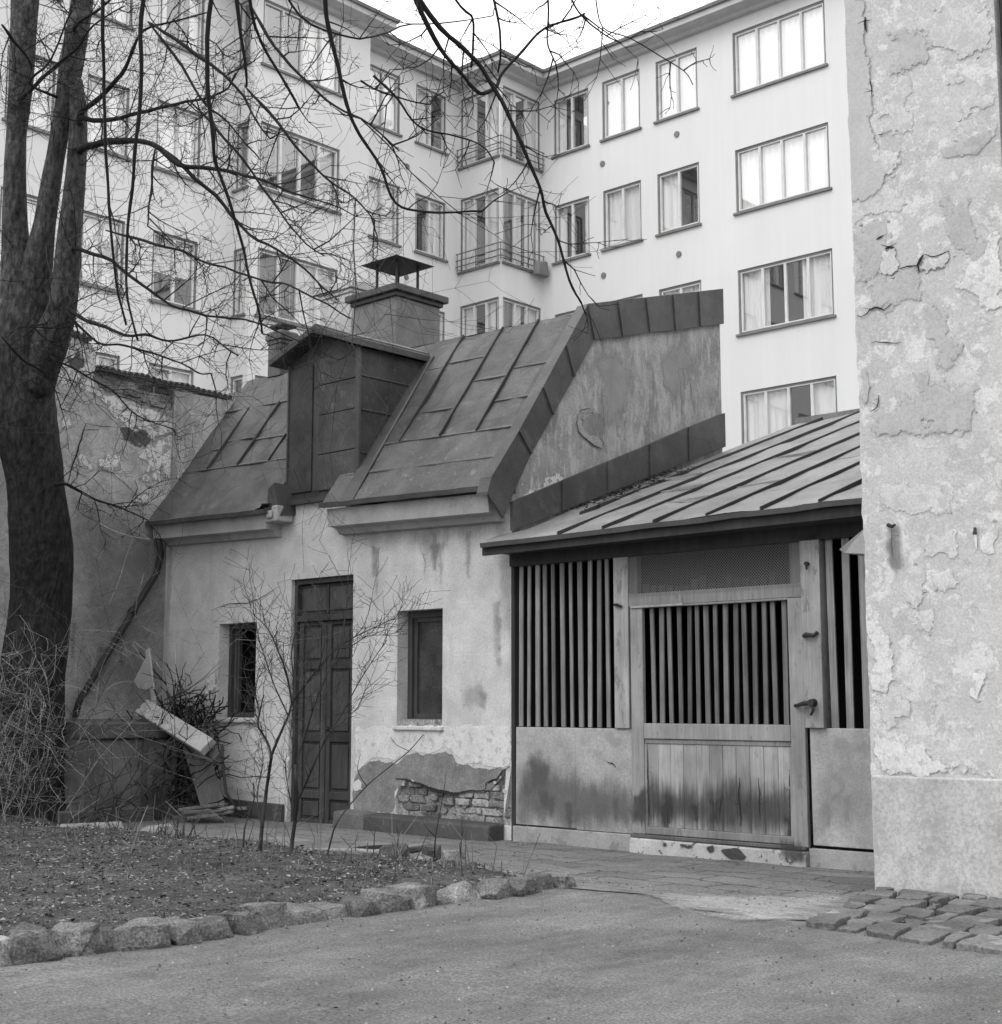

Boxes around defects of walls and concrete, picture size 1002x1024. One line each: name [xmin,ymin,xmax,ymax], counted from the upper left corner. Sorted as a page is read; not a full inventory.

peeling [915,4,992,60]
peeling [845,0,906,282]
peeling [938,194,1002,311]
peeling [912,304,964,392]
spalling [58,337,172,509]
peeling [923,529,959,592]
peeling [973,519,999,555]
peeling [866,617,895,694]
spalling [969,672,986,702]
peeling [352,723,511,824]
water stain [518,759,803,861]
peeling [873,734,997,778]